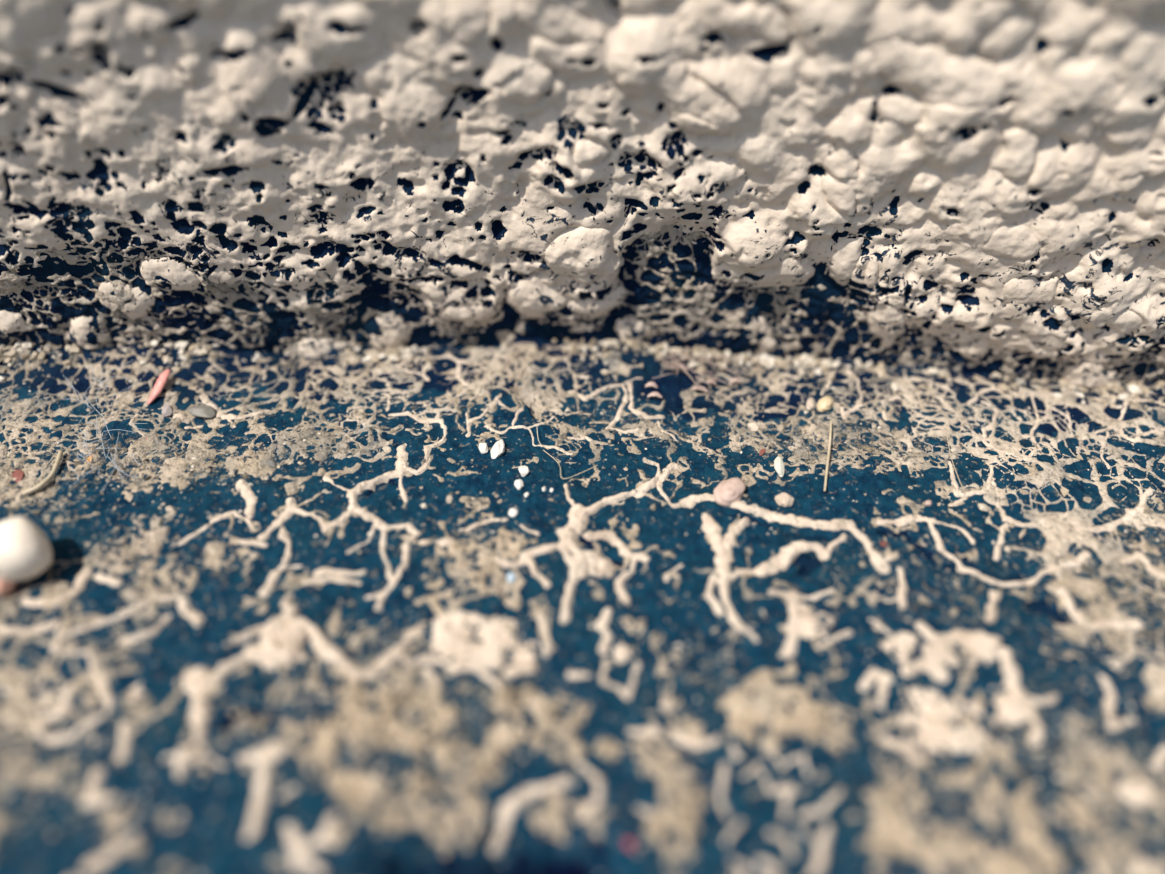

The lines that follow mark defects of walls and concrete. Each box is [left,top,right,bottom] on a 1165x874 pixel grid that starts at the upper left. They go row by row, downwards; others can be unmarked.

peeling [54,22,135,80]
peeling [198,44,249,62]
peeling [327,21,367,36]
peeling [746,37,797,64]
peeling [1035,37,1051,55]
peeling [0,67,91,110]
peeling [240,68,357,137]
peeling [440,68,499,121]
peeling [868,84,902,123]
peeling [163,594,856,874]
peeling [81,721,136,809]
peeling [863,674,1165,874]